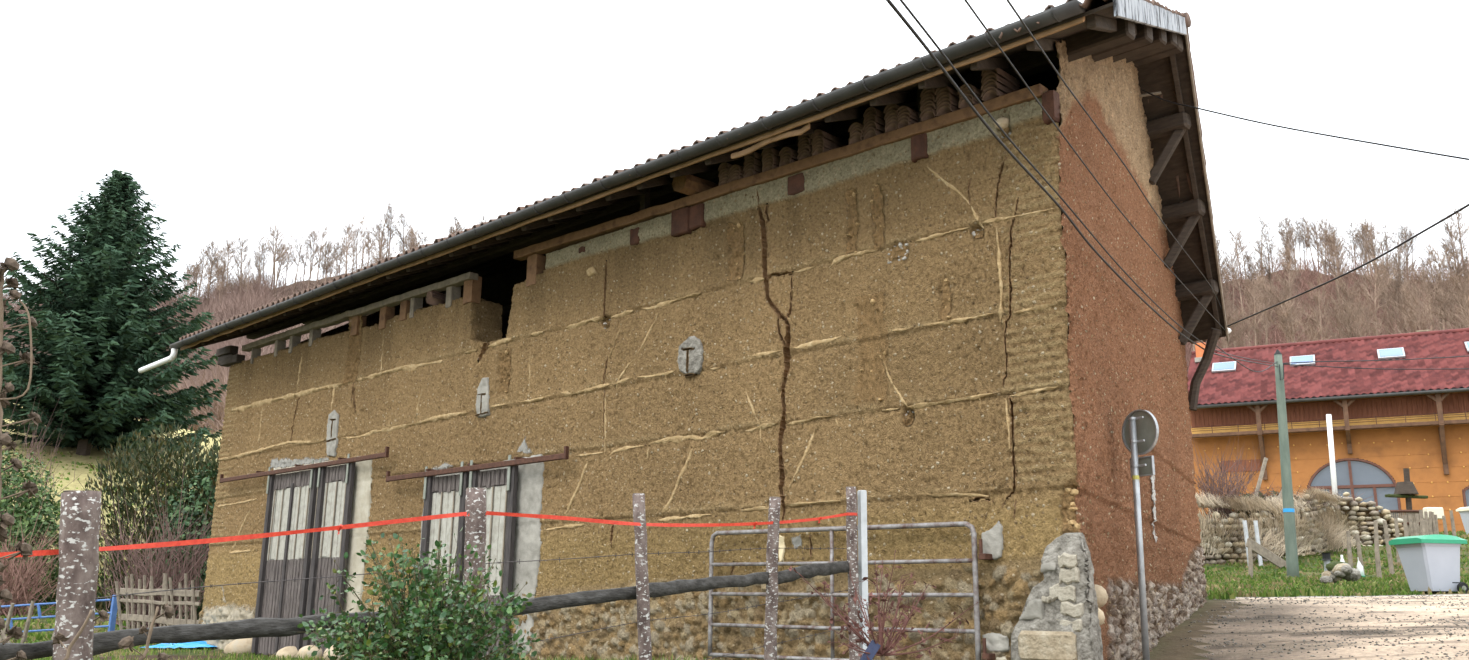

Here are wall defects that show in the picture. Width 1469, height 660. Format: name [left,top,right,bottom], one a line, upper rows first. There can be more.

crack [756,191,813,557]
crack [967,157,1019,518]